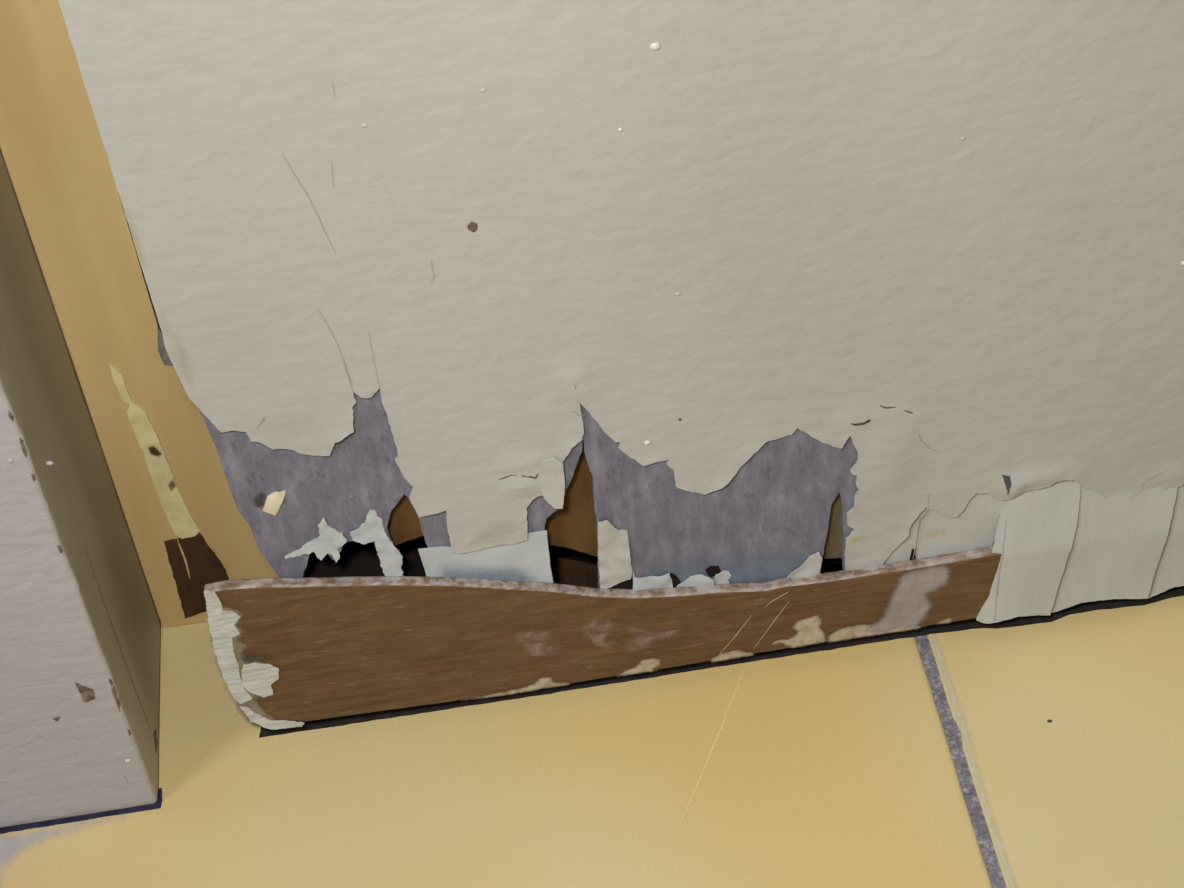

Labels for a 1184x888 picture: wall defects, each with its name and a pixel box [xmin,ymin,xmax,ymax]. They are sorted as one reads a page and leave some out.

peeling [197,389,858,590]
peeling [204,590,304,730]